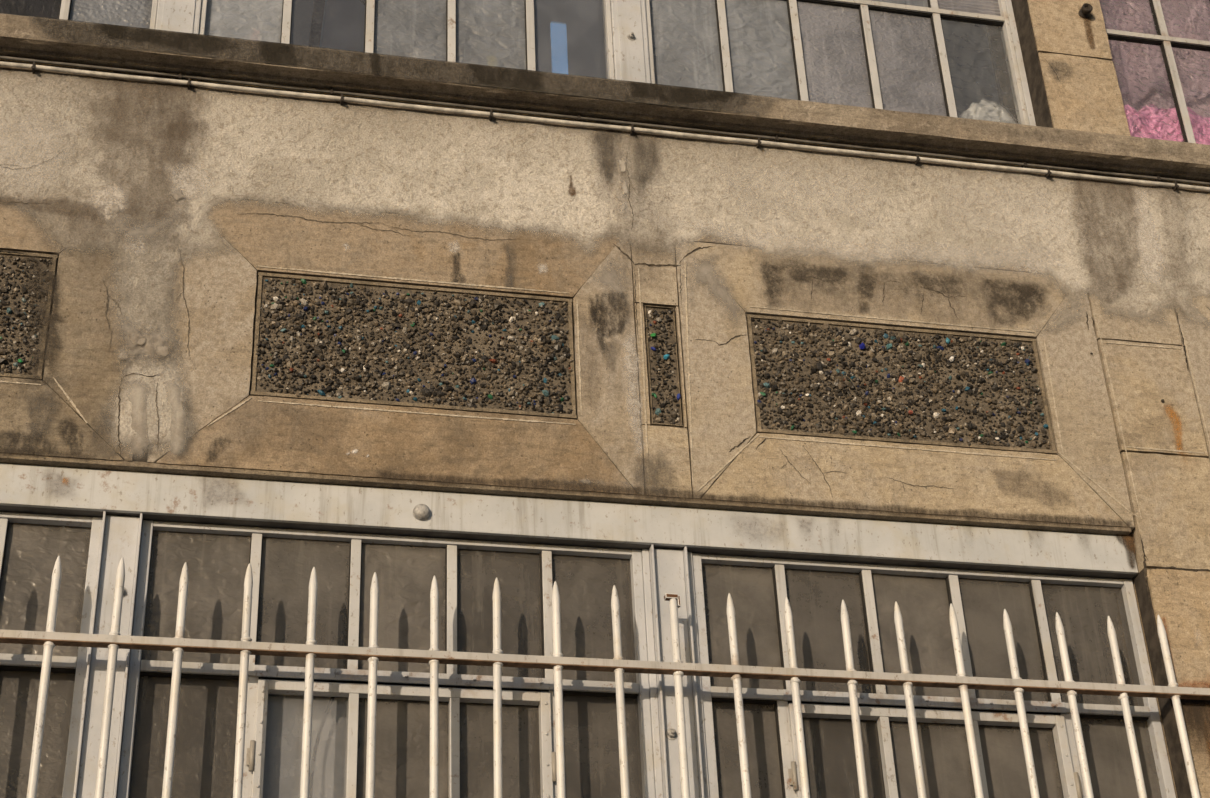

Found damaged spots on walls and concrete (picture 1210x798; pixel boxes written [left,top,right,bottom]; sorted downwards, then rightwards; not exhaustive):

damp [105,71,197,233]
damp [591,293,627,349]
damp [794,268,845,281]
damp [991,284,1041,321]
crack [729,436,844,497]